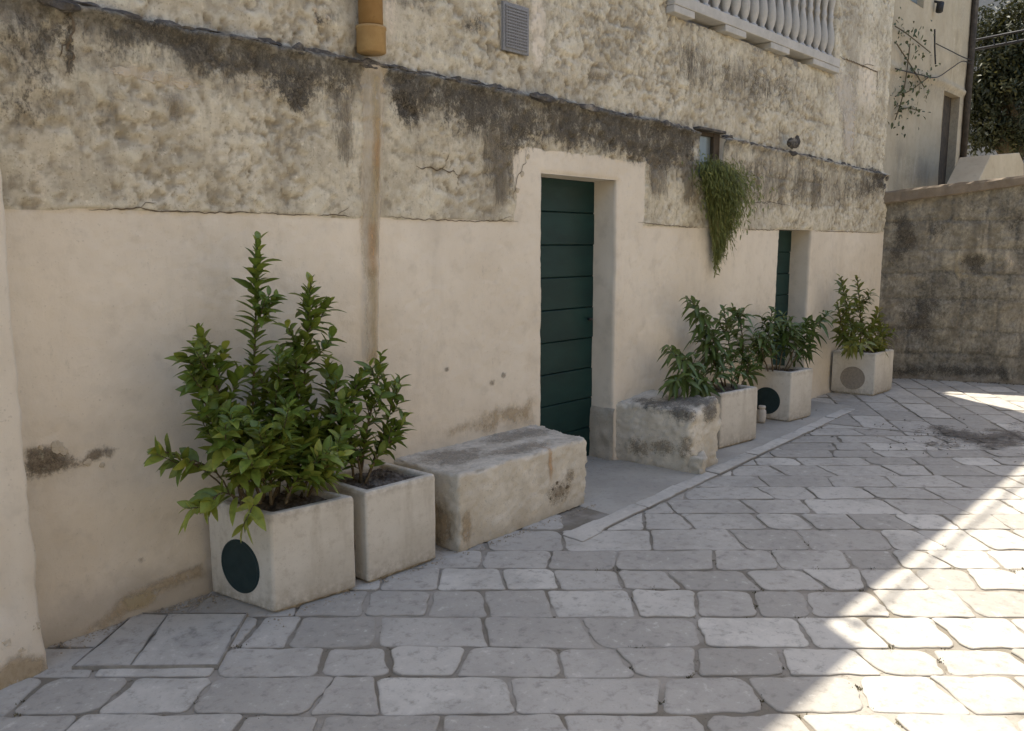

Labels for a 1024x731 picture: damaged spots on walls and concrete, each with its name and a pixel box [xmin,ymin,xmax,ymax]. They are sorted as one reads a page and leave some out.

leakage [1,9,74,113]
leakage [100,13,353,165]
leakage [388,70,695,203]
spalling [26,440,112,476]